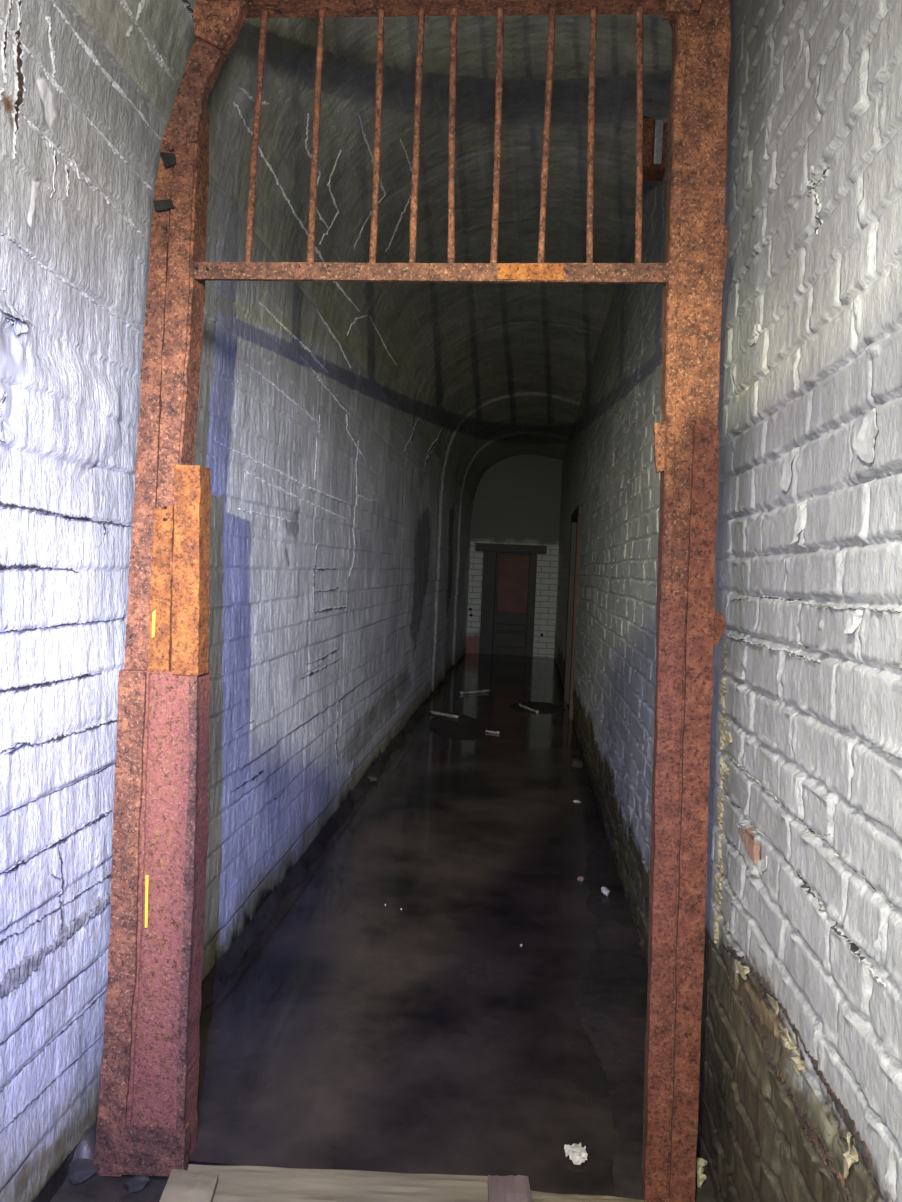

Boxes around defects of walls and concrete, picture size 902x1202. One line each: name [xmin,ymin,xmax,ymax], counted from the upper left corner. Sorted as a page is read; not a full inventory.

crack [1,0,26,159]
crack [50,151,70,198]
rust [498,263,564,281]
crack [0,501,132,537]
crack [0,561,79,573]
crack [0,672,101,694]
crack [0,719,117,755]
rust [176,675,199,1131]